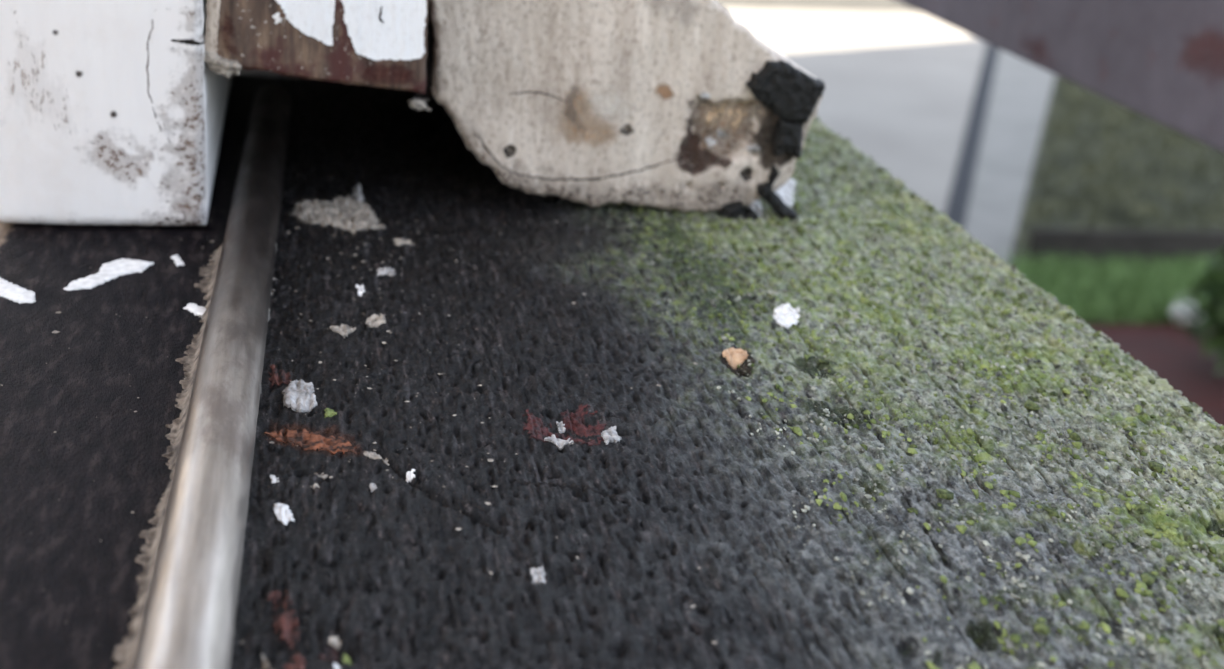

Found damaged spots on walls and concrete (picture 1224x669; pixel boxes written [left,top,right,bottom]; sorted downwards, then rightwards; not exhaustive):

peeling [272,0,427,61]
crack [146,9,205,143]
damp [751,106,795,169]
peeling [0,277,36,304]
peeling [64,258,154,291]
peeling [183,303,206,317]
rust [264,422,358,455]